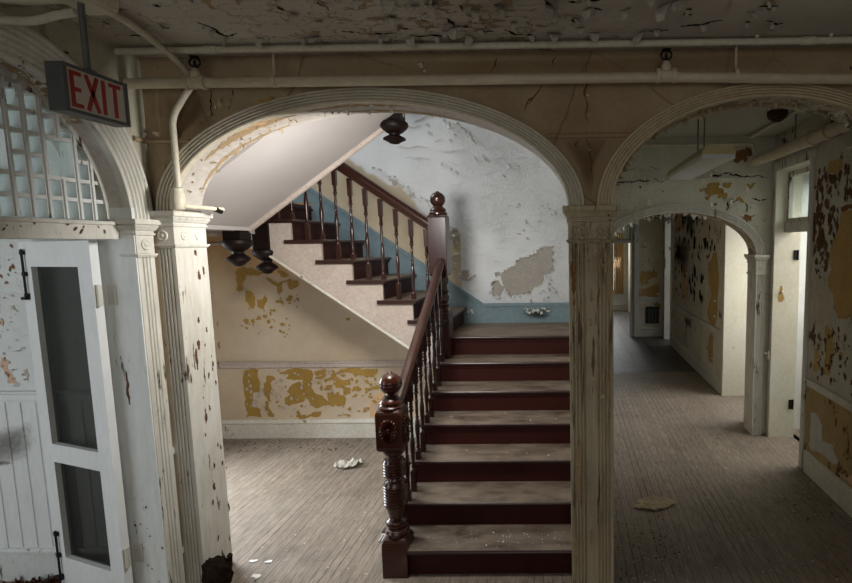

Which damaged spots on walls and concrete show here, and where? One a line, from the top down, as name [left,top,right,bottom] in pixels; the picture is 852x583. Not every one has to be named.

peeling [613,97,807,198]
peeling [699,182,756,203]
peeling [614,213,719,365]
peeling [813,158,852,397]
peeling [0,339,29,387]
peeling [243,368,385,419]
peeling [809,411,852,485]